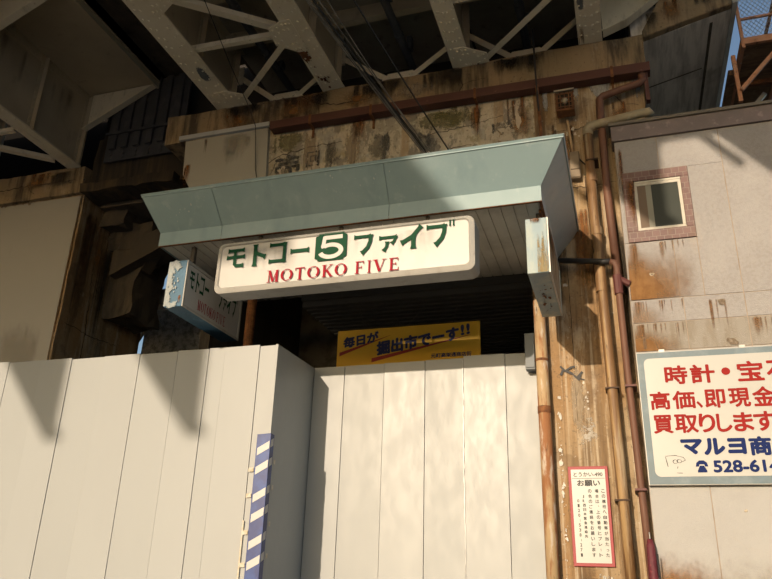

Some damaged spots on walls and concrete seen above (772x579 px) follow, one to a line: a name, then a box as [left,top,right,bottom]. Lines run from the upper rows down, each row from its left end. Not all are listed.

leakage [355,68,462,97]
rust [471,107,479,130]
peeling [485,103,521,144]
rust [507,96,528,132]
rust [628,260,676,300]
rust [635,335,665,352]